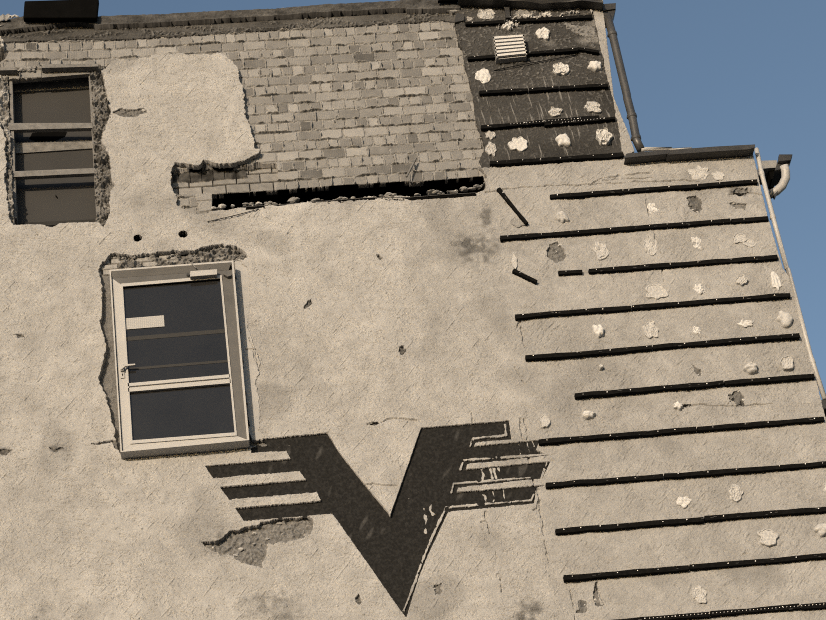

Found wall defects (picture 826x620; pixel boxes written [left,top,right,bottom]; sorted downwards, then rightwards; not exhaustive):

spalling [97,246,246,454]
spalling [204,518,313,568]